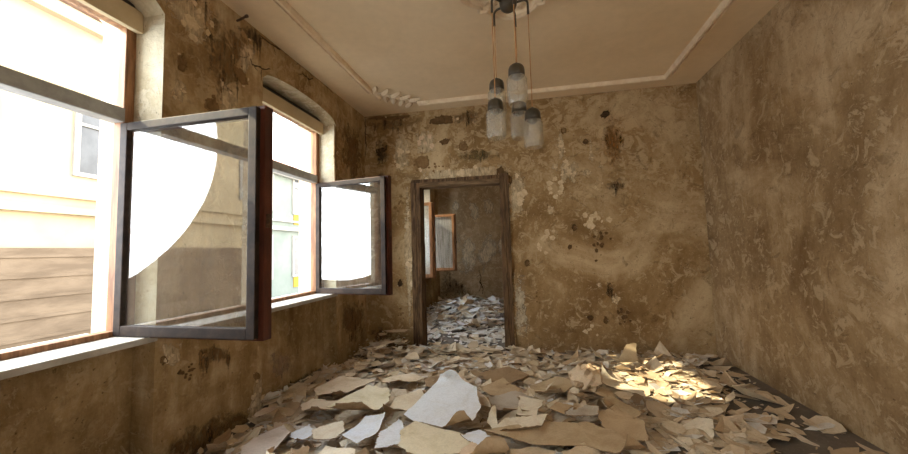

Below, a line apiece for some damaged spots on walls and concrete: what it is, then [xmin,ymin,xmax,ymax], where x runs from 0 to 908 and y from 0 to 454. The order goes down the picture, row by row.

flaking render [164,0,256,112]
flaking render [392,114,528,220]
flaking render [546,128,594,214]
flaking render [572,211,612,262]